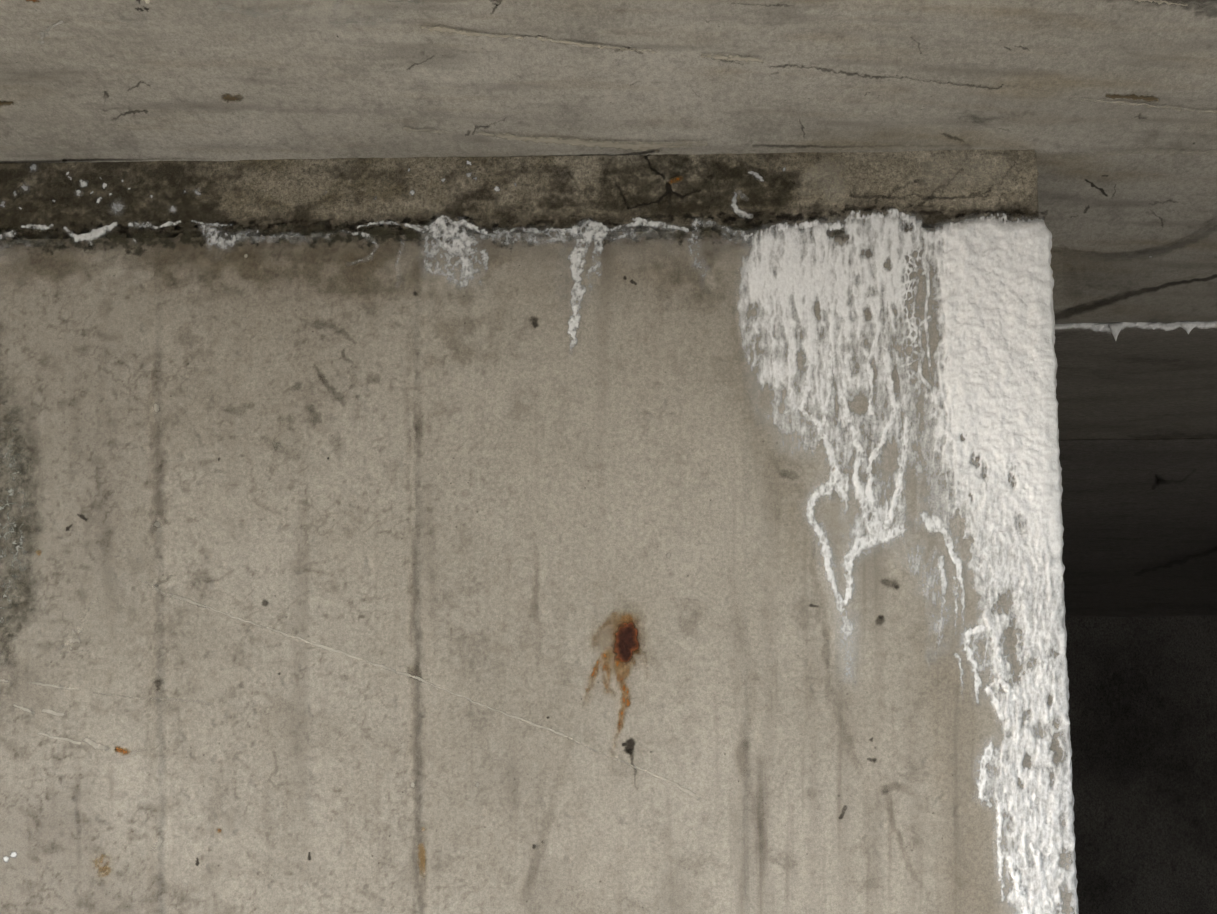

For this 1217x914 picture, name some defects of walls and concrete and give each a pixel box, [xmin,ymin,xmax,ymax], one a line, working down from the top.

crack [772,64,885,79]
crack [0,149,1047,237]
damp [329,215,712,348]
crack [1055,274,1217,319]
damp [726,194,1217,914]
rust [586,615,640,731]